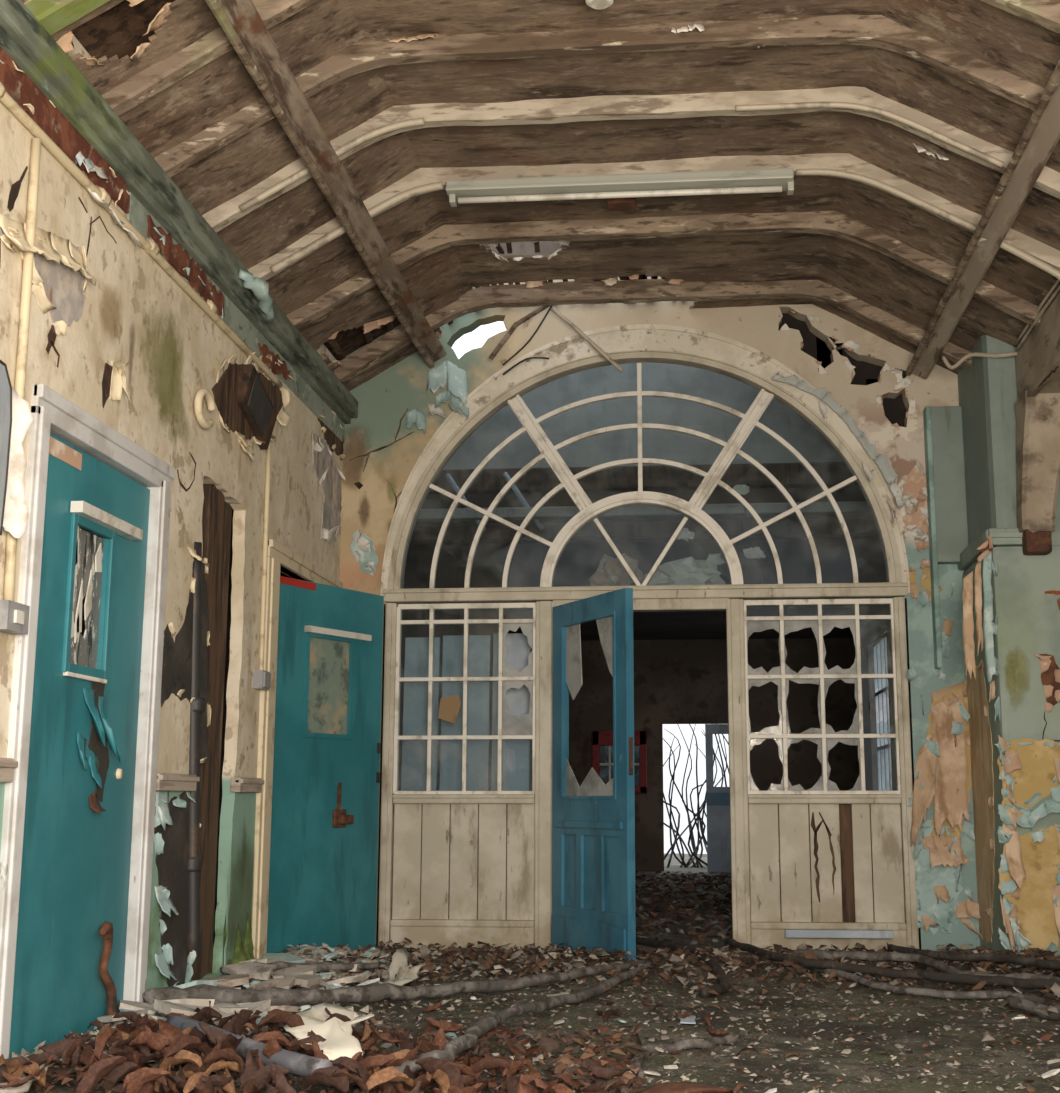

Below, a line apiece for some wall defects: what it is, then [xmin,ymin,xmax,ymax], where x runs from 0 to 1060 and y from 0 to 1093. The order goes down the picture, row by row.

flaking render [0,47,225,336]
spalling [194,343,294,460]
peeling [771,310,1060,952]
peeling [154,791,201,986]